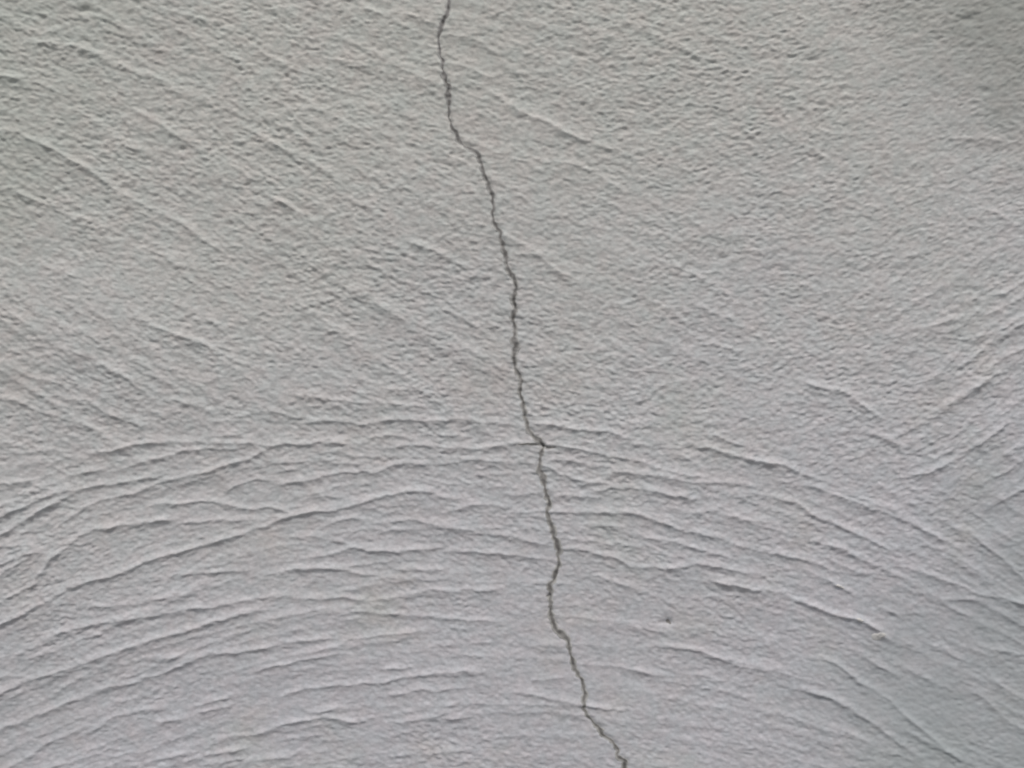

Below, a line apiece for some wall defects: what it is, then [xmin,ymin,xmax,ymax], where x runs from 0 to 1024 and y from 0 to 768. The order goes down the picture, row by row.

crack [437,0,629,768]